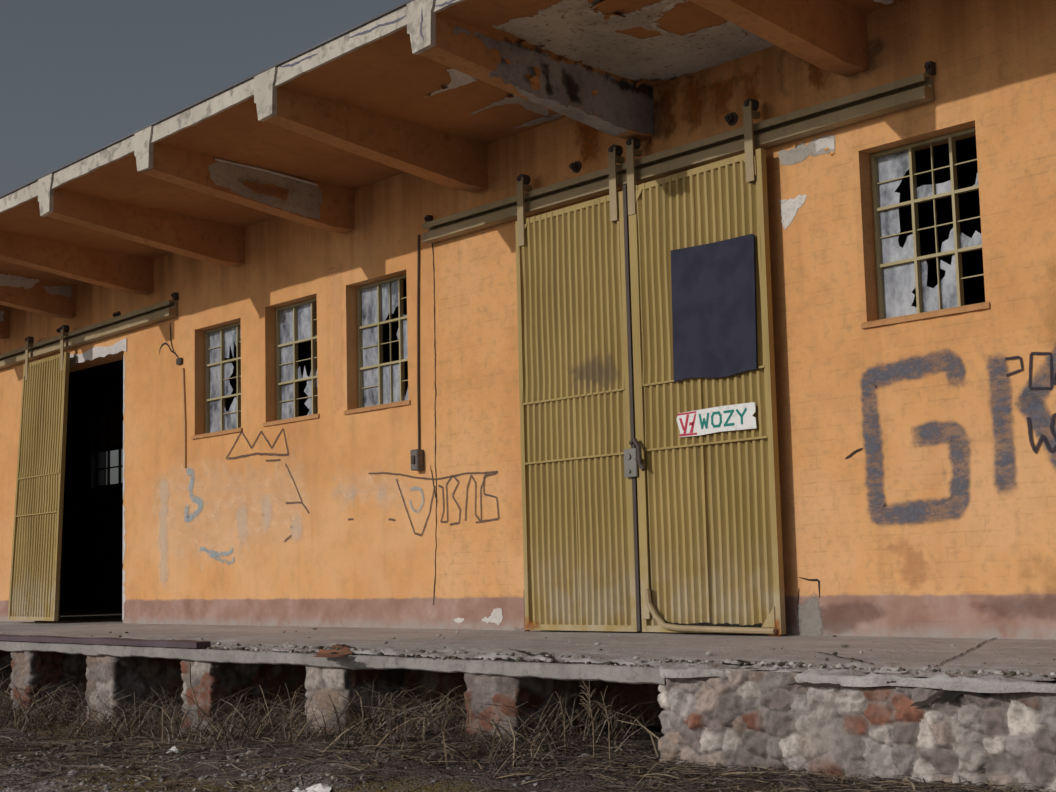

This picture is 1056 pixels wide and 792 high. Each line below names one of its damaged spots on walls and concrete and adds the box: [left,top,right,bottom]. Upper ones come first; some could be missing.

peeling [424,0,775,136]
peeling [778,135,835,166]
spalling [209,158,322,219]
peeling [779,194,807,229]
spalling [0,274,72,297]
spalling [313,644,356,657]
crack [819,638,994,684]
crack [788,680,841,688]